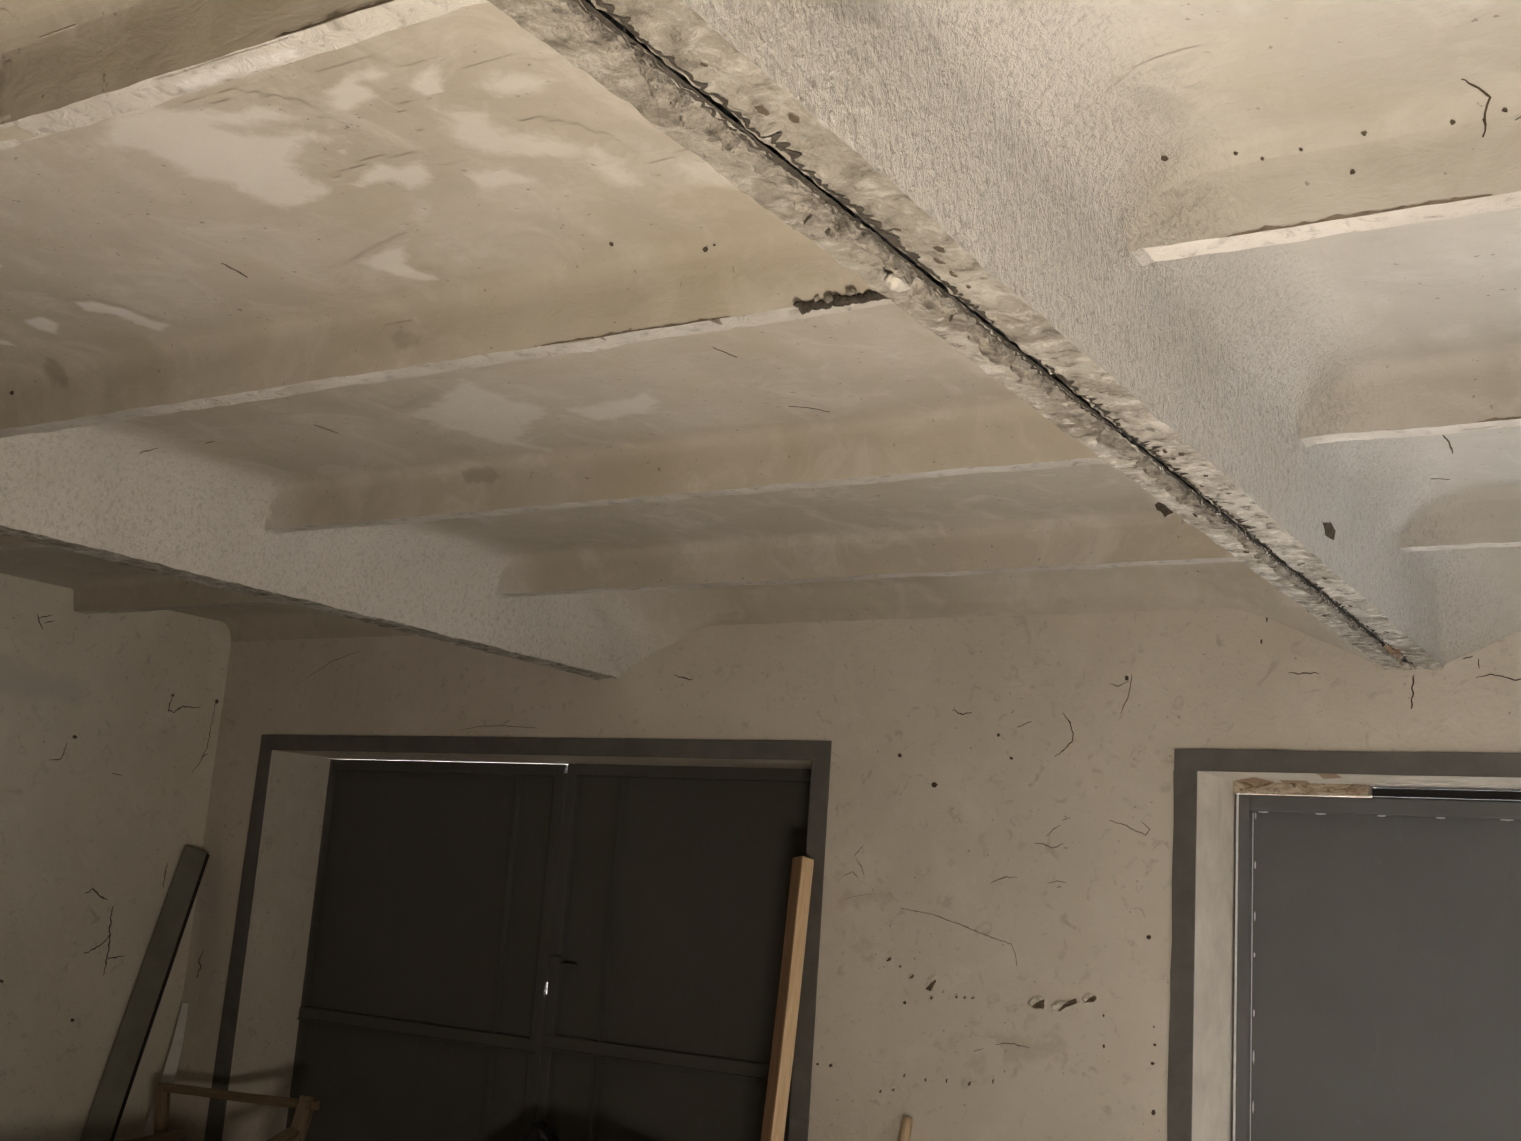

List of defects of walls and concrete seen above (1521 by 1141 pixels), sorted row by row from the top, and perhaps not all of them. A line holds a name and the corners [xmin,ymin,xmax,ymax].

crack [1461,79,1521,137]
spalling [793,289,889,315]
spalling [541,316,730,346]
crack [540,0,1415,714]
crack [1430,435,1453,480]
spalling [1153,501,1175,520]
spalling [1321,521,1336,541]
crack [1463,656,1521,681]
crack [84,888,125,975]
crack [901,908,1017,966]
flaking render [1027,993,1105,1017]